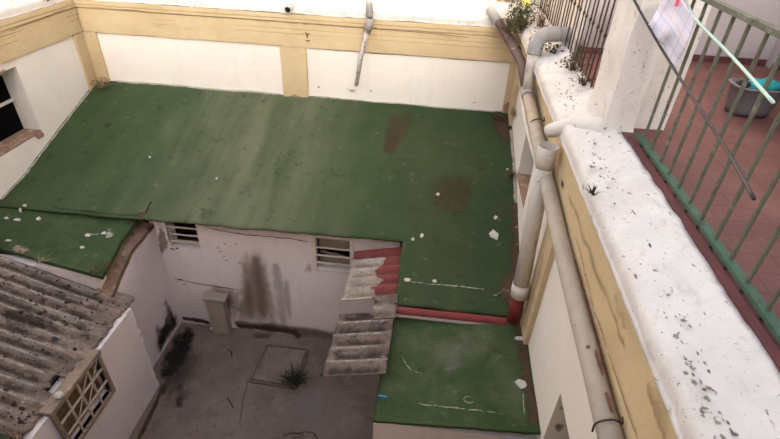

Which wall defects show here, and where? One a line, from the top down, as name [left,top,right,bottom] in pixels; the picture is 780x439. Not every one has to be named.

water stain [137,301,210,439]
water stain [216,263,335,339]